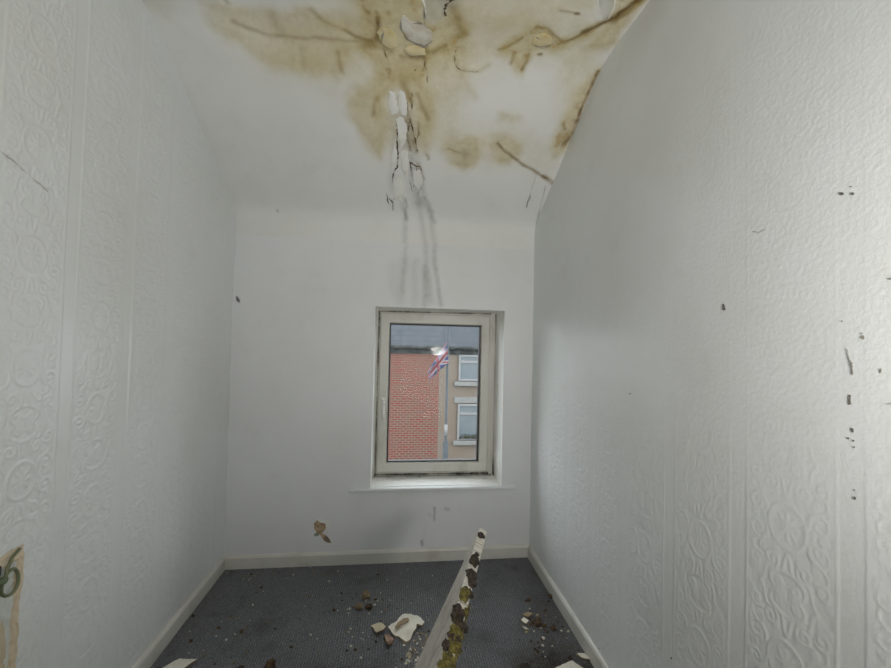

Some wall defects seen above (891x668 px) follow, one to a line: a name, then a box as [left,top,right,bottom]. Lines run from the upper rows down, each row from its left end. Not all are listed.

crack [386,61,428,207]
flaking render [314,519,331,543]